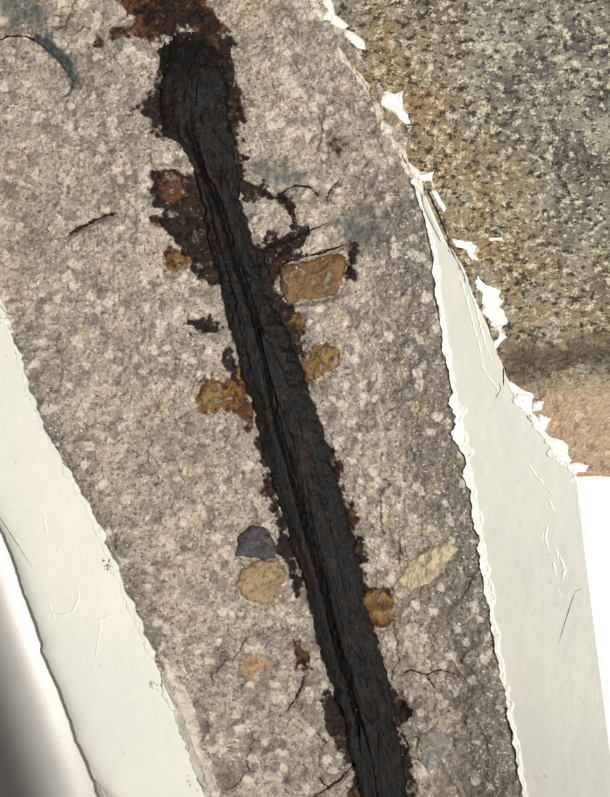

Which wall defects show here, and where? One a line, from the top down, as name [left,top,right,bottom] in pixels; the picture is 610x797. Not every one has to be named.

crack [0,35,75,82]
crack [68,212,118,236]
corrosion [92,0,312,384]
corrosion [327,137,347,156]
corrosion [345,242,360,281]
spalling [0,0,356,797]
spalling [199,0,528,797]
corrosion [328,445,394,598]
corrosion [391,689,418,797]